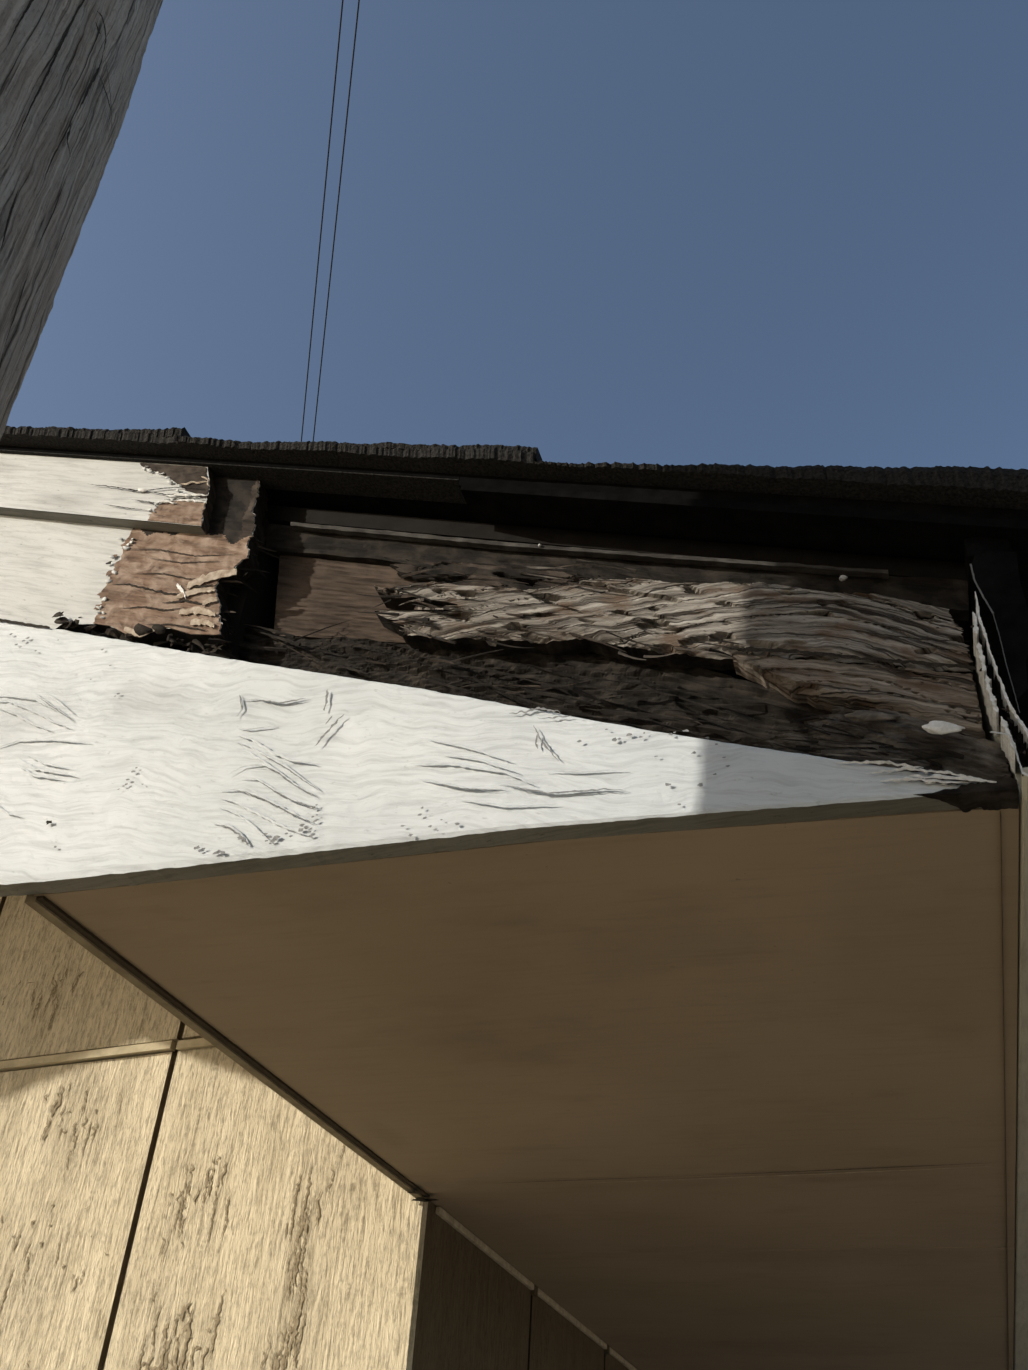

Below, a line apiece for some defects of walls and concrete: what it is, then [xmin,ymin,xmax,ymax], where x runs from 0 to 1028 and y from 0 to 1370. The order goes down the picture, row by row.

peeling [93,463,259,637]
peeling [971,592,1028,776]
peeling [835,760,997,786]